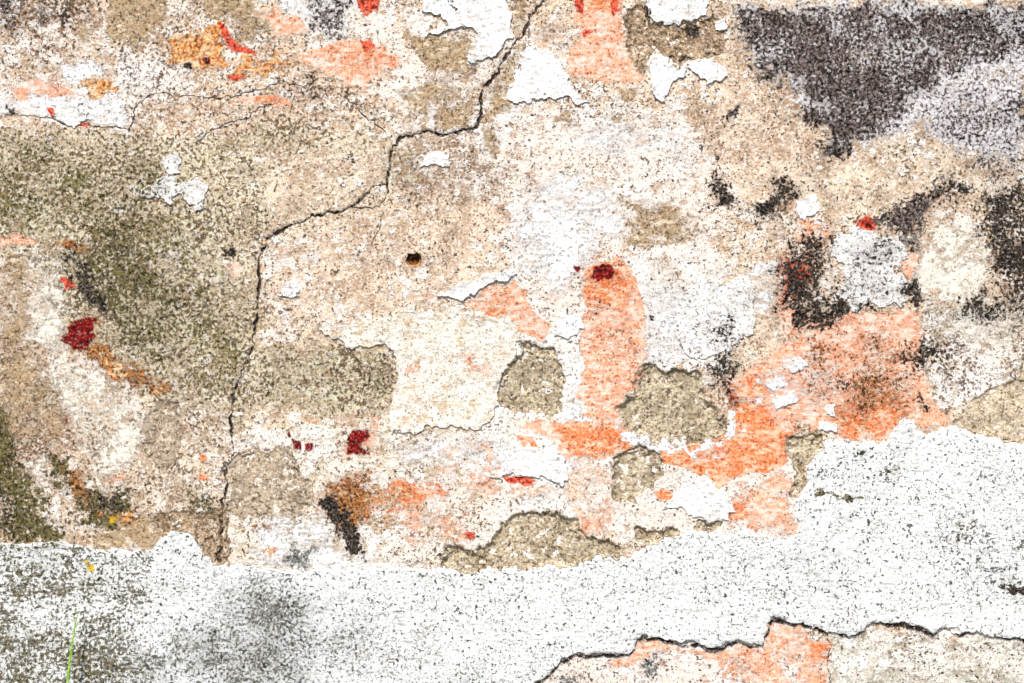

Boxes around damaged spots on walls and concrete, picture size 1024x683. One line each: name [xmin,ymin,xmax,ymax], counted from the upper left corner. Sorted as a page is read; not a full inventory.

peeling [0,18,128,129]
crack [216,0,545,562]
flaking render [390,145,451,188]
peeling [203,0,728,171]
mould [732,0,1024,433]
peeling [92,169,1024,576]
peeling [607,622,835,683]
peeling [911,614,965,634]